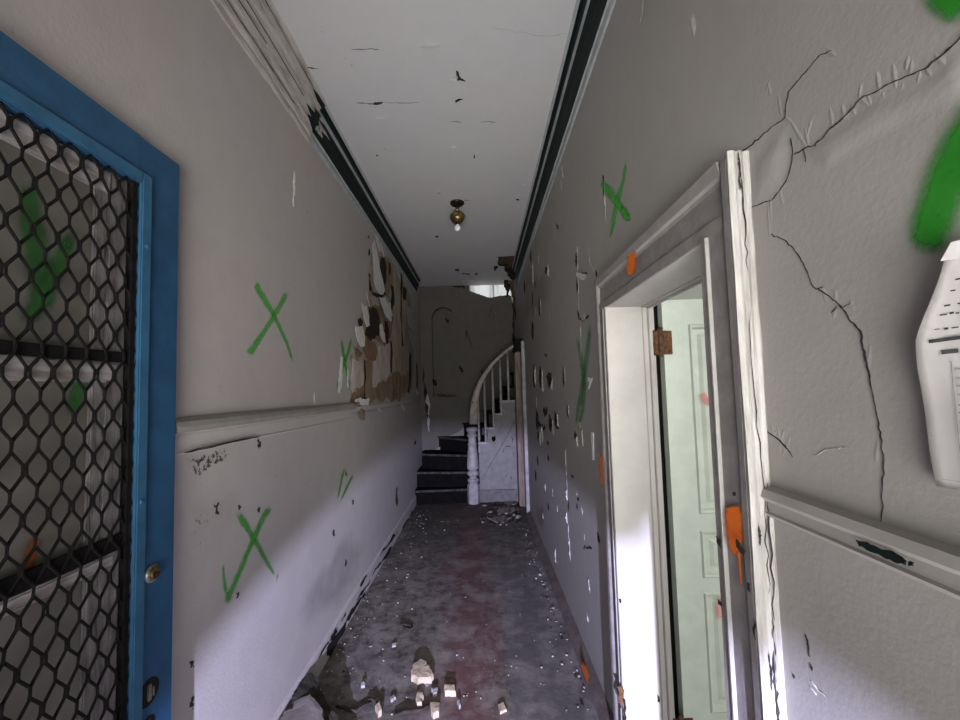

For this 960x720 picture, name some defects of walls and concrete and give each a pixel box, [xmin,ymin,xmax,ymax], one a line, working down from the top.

peeling [307,89,329,139]
peeling [338,234,437,432]
peeling [452,269,512,303]
peeling [494,250,550,340]
crack [737,37,960,522]
peeling [533,364,569,491]
peeling [542,423,594,562]
crack [749,311,792,720]
spalling [856,540,914,566]